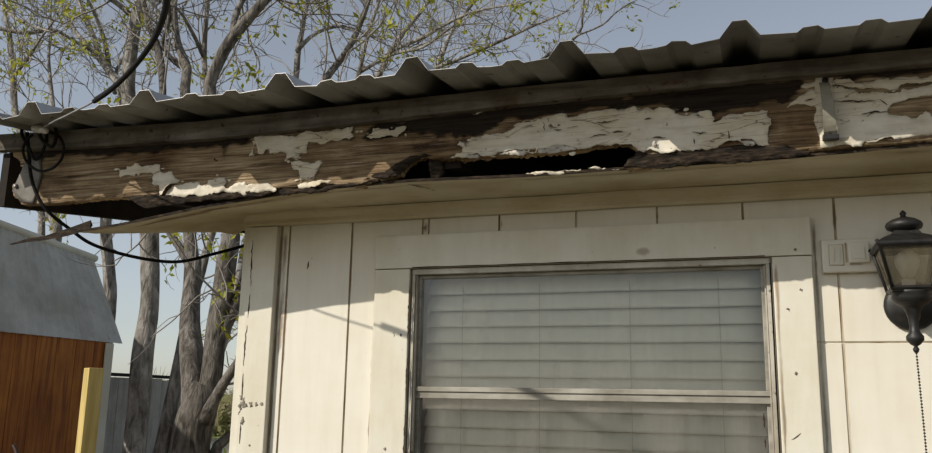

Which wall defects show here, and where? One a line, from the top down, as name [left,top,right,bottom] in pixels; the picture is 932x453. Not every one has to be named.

peeling [114,163,277,197]
peeling [249,126,407,189]
peeling [526,166,619,175]
peeling [451,106,771,158]
peeling [787,82,820,136]
peeling [833,76,932,147]
spalling [238,395,263,425]